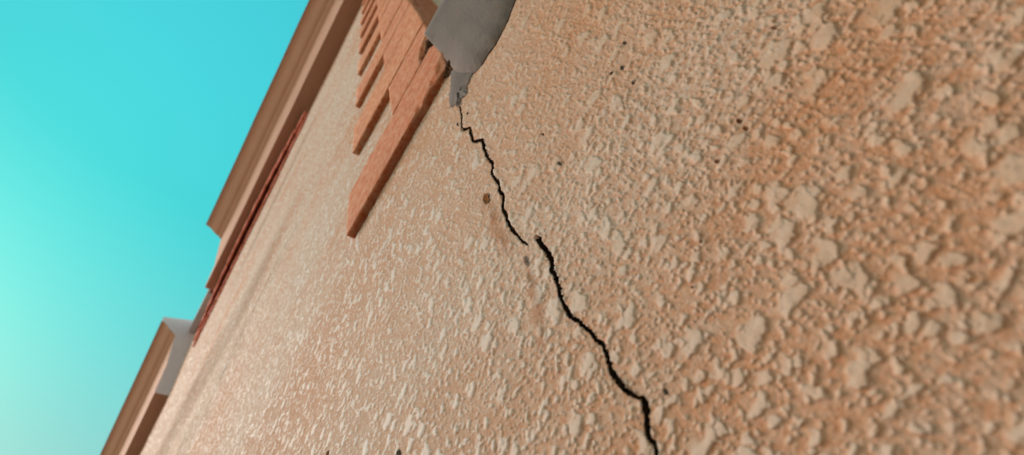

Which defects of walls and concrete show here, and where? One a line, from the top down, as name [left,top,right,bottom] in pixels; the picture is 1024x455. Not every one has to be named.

crack [456,93,659,455]